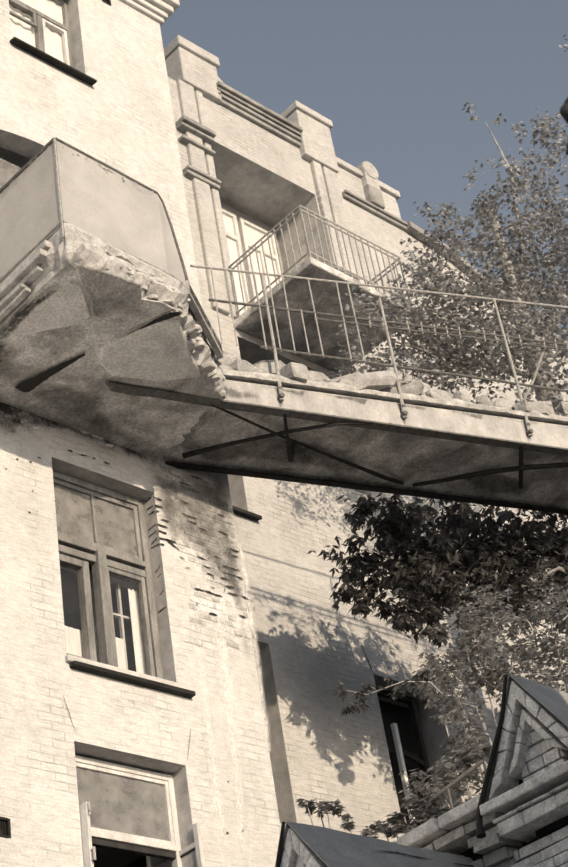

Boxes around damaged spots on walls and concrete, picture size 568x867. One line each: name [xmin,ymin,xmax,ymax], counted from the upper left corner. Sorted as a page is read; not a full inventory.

peeling [0,236,226,399]
water stain [0,402,93,438]
water stain [159,479,248,587]